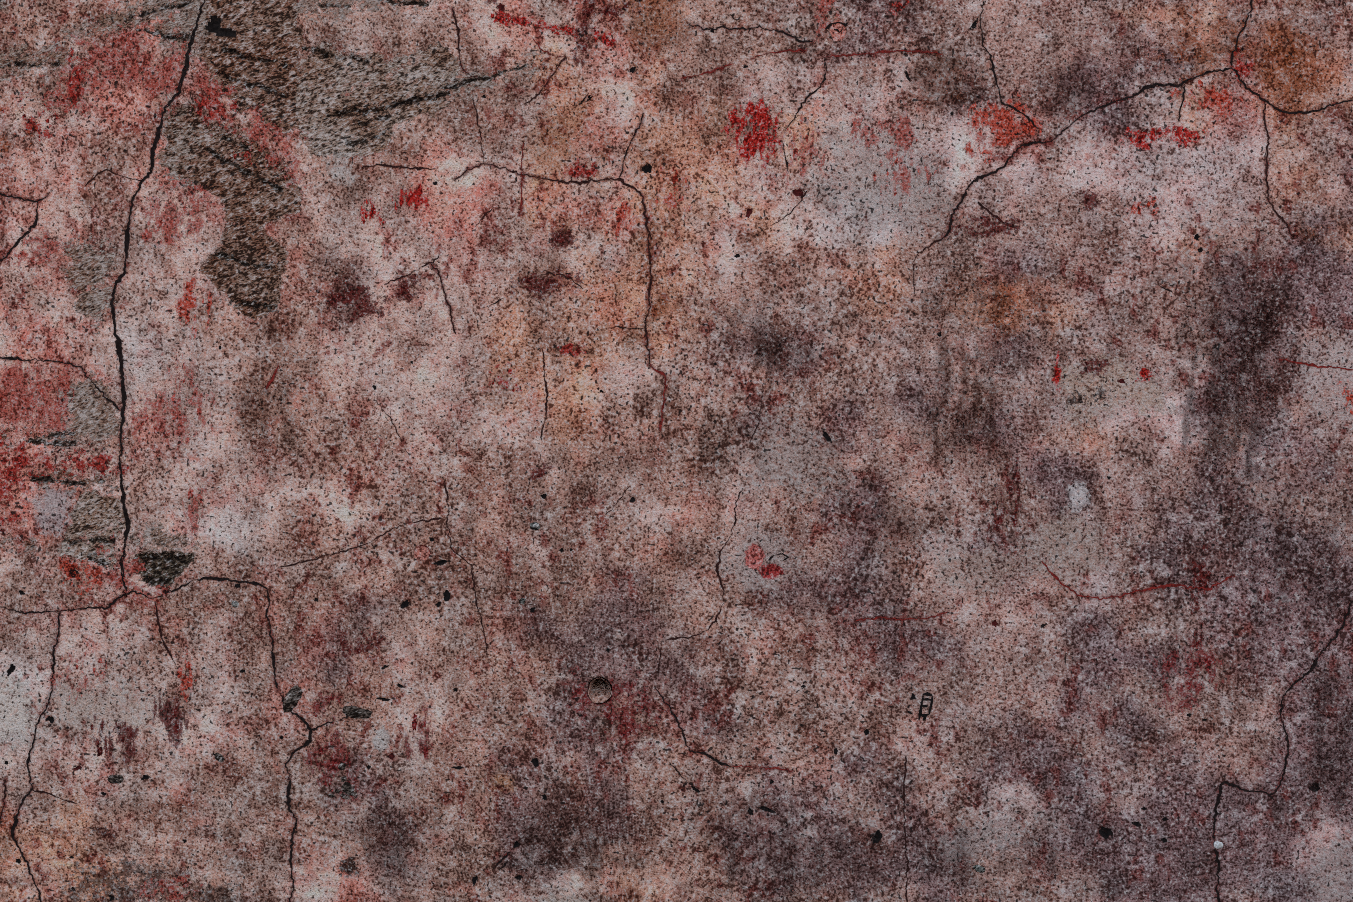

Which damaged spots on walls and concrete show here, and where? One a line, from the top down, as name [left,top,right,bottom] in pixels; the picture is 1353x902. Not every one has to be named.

crack [362,7,668,440]
crack [912,0,1353,293]
crack [0,0,488,902]
crack [1212,601,1353,902]